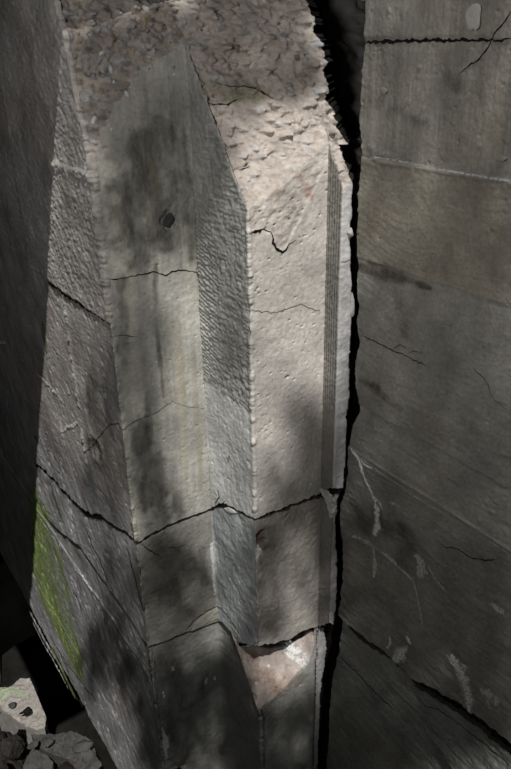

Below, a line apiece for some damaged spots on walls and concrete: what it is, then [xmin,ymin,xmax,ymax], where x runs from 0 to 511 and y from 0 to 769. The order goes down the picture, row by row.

crack [365,12,511,74]
crack [47,281,139,338]
crack [111,269,200,280]
crack [252,227,294,254]
crack [345,193,426,432]
crack [84,401,199,453]
damp [34,483,93,600]
crack [311,488,342,602]
damp [31,533,82,695]
crack [186,606,267,650]
crack [312,621,393,769]
crack [418,682,511,765]